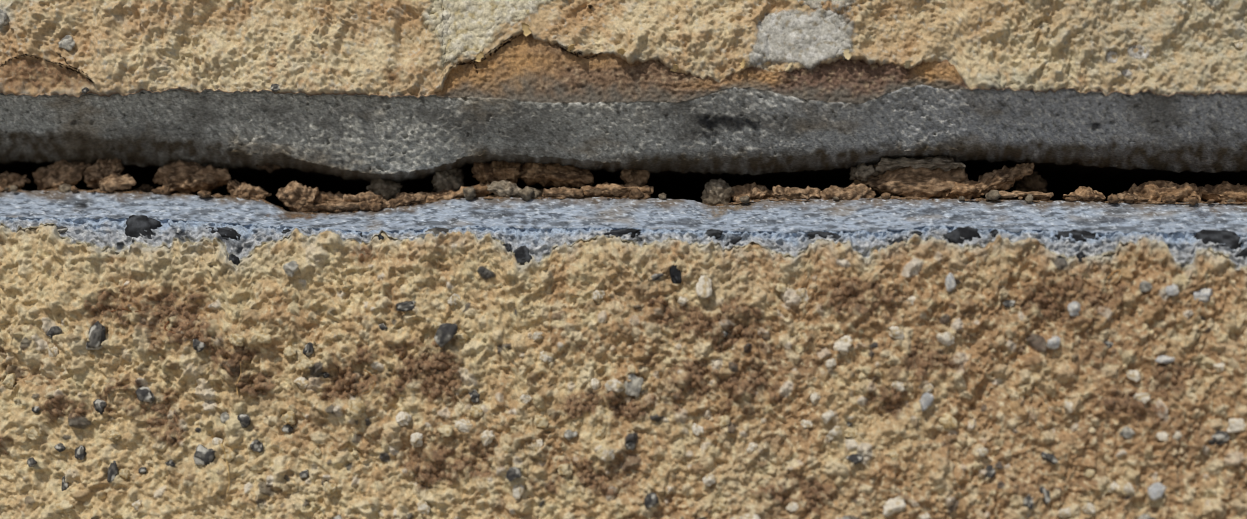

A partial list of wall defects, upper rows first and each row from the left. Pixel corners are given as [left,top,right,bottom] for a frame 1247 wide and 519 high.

spalling [423,0,969,105]